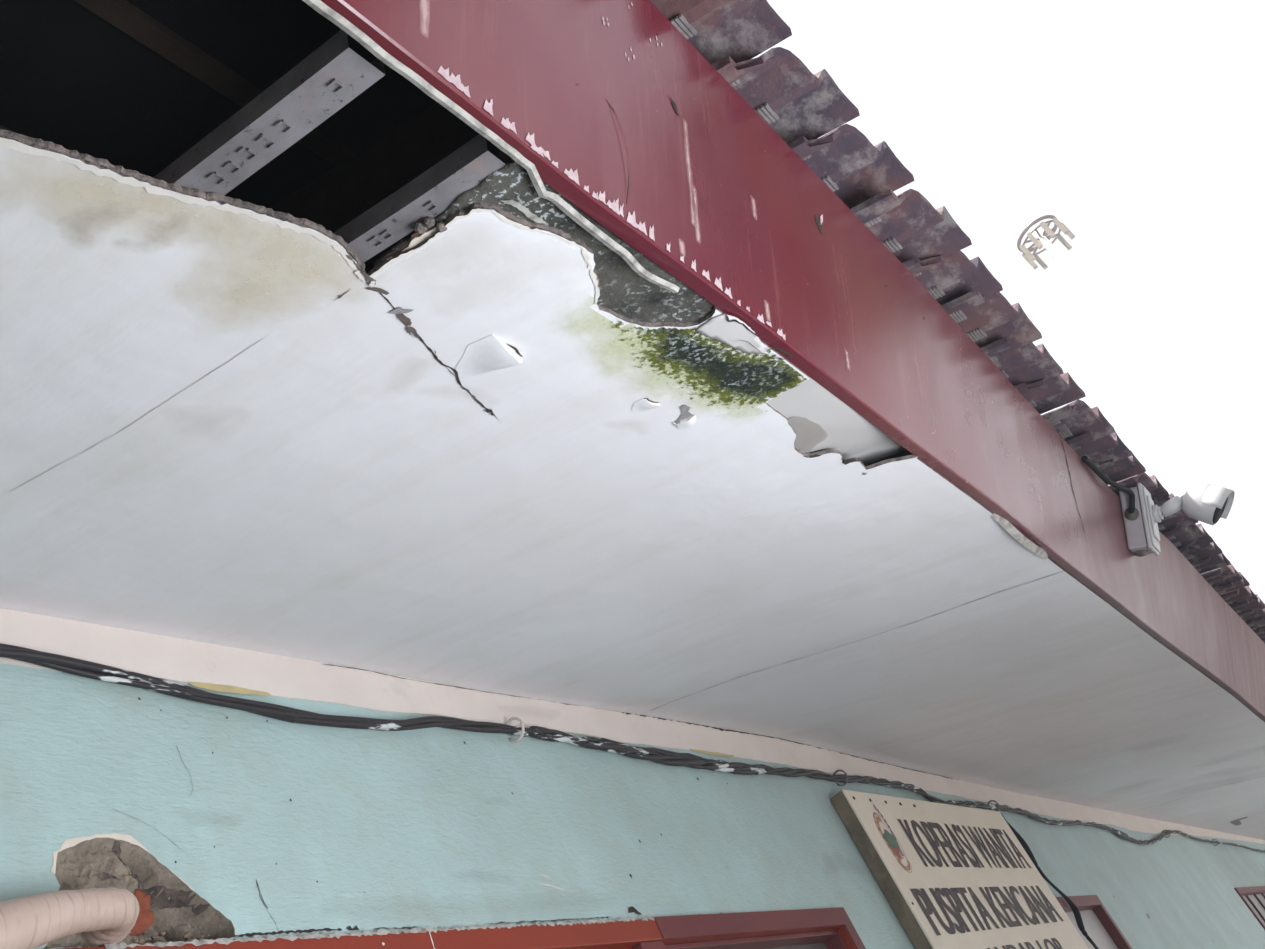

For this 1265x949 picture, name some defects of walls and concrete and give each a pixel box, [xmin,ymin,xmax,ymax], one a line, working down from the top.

peeling [0,0,793,360]
crack [333,287,498,419]
peeling [767,378,905,475]
spalling [43,932,95,949]
spalling [51,833,236,945]